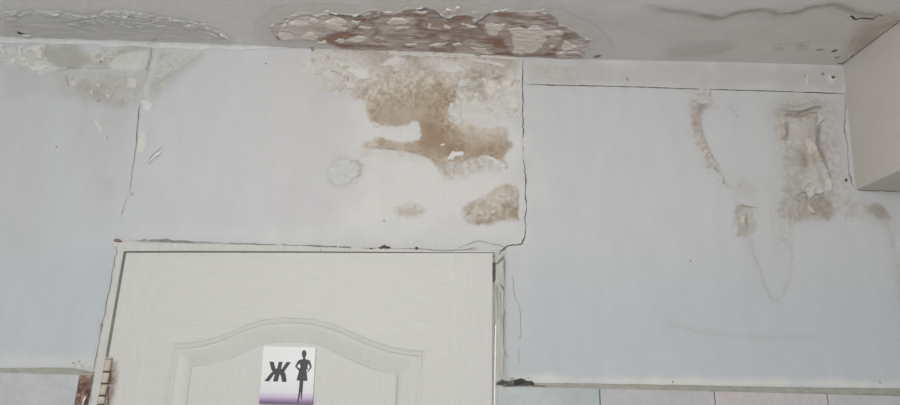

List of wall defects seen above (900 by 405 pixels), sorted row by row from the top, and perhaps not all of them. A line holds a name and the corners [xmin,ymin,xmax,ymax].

flaking render [0,9,232,44]
crack [121,40,162,215]
spalling [251,0,614,124]
water stain [357,68,521,228]
crack [138,62,897,368]
peeling [685,86,733,191]